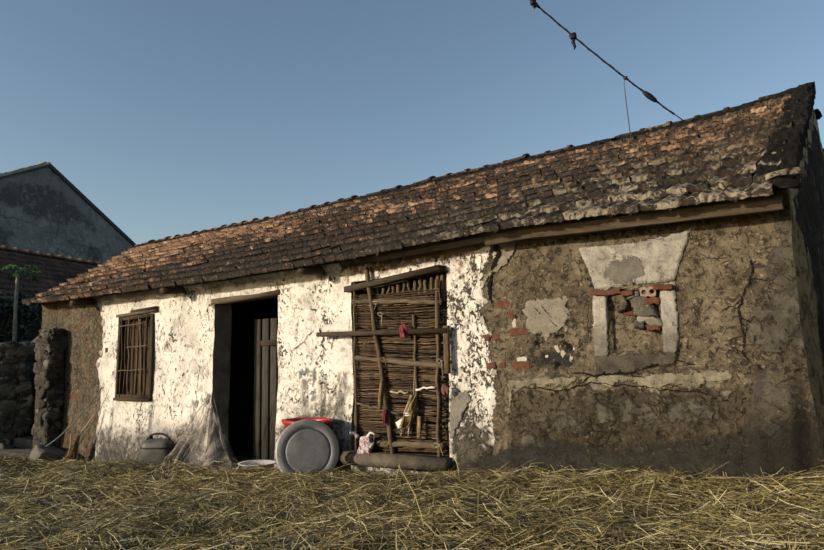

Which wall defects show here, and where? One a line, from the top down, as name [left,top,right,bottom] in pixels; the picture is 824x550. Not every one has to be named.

peeling [799,111,824,168]
spalling [472,178,808,475]
crack [510,329,735,415]